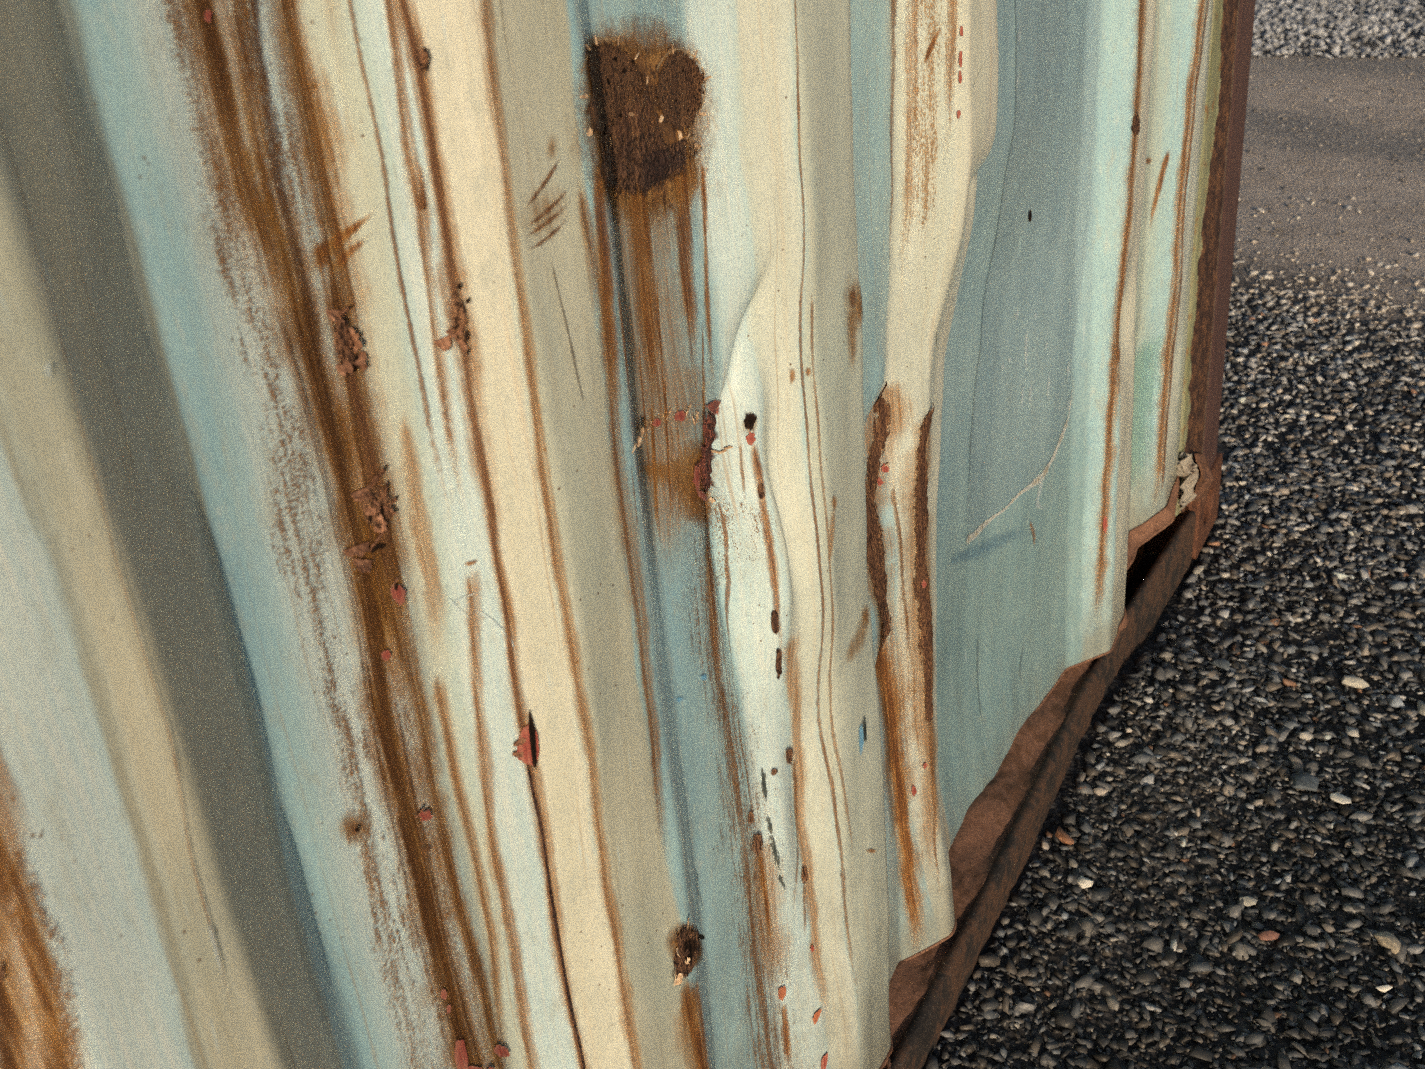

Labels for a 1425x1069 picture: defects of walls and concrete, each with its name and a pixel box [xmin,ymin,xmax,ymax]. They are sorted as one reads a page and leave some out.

corrosion [0,773,83,1069]
corrosion [157,0,532,1069]
peeling [326,305,369,378]
peeling [343,468,398,573]
peeling [512,712,539,769]
corrosion [525,341,640,1069]
peeling [632,399,733,523]
corrosion [682,497,821,1069]
corrosion [790,0,852,942]
corrosion [850,381,938,923]
corrosion [1098,0,1145,587]
corrosion [1156,0,1209,493]